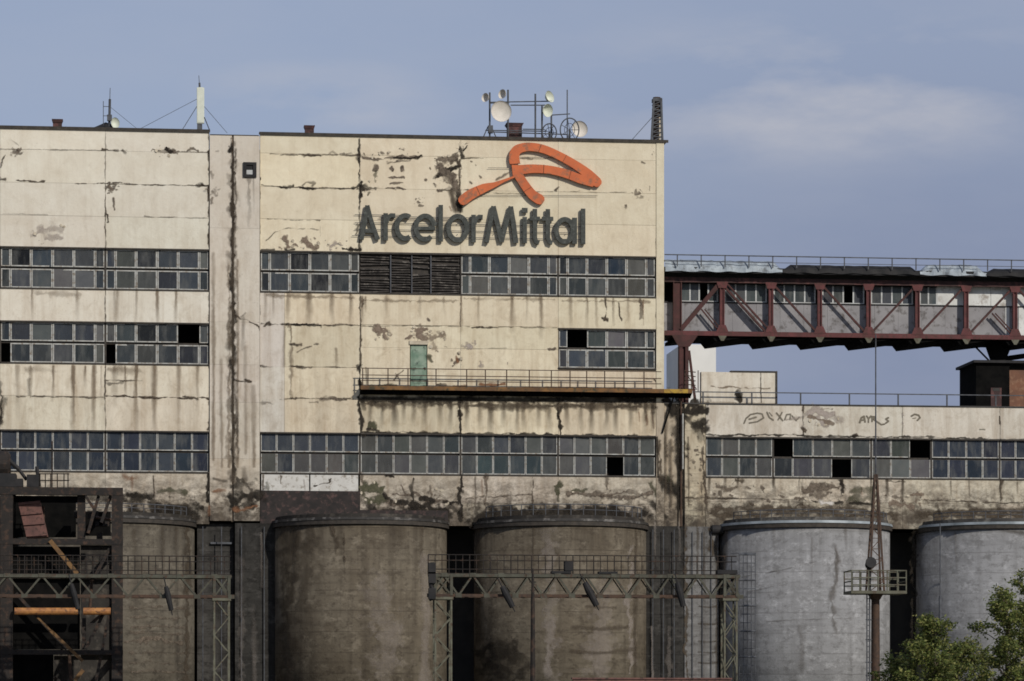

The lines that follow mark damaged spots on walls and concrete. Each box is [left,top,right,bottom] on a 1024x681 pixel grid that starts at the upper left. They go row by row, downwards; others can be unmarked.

crack [0,156,45,183]
spalling [358,145,482,213]
crack [16,137,376,503]
peeling [372,324,391,340]
peeling [405,318,446,362]
leakage [72,365,95,404]
peeling [806,405,839,427]
leakage [360,383,693,519]
leakage [711,503,814,516]
leakage [829,501,885,516]
leakage [919,480,1024,516]